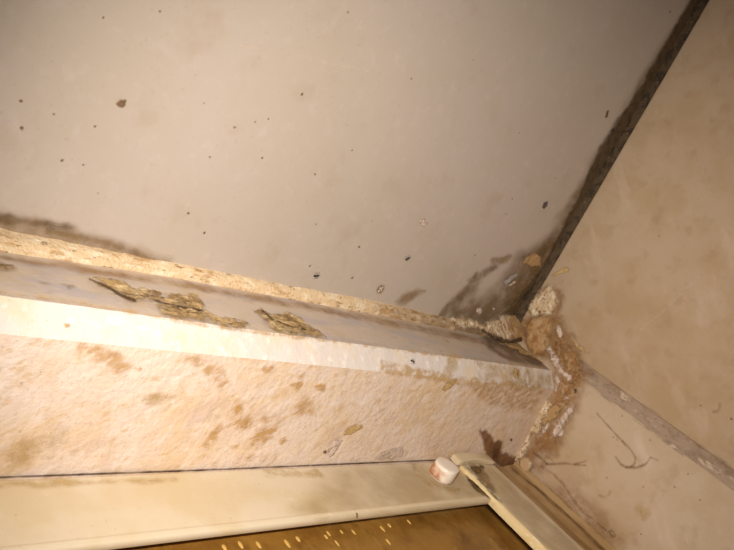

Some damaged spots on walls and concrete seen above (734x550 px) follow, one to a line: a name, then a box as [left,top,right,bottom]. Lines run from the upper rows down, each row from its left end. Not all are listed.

damp [451,0,702,343]
peeling [91,276,248,328]
peeling [255,309,326,336]
damp [514,400,562,461]